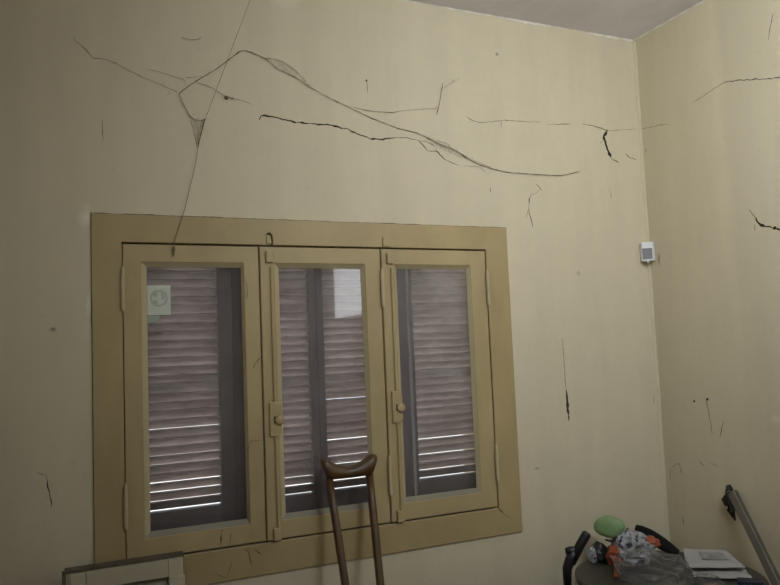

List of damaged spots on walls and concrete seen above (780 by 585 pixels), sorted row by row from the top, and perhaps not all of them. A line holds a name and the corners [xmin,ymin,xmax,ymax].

crack [696,77,780,101]
crack [259,114,455,164]
crack [590,124,668,162]
crack [749,210,780,231]
crack [561,340,569,420]